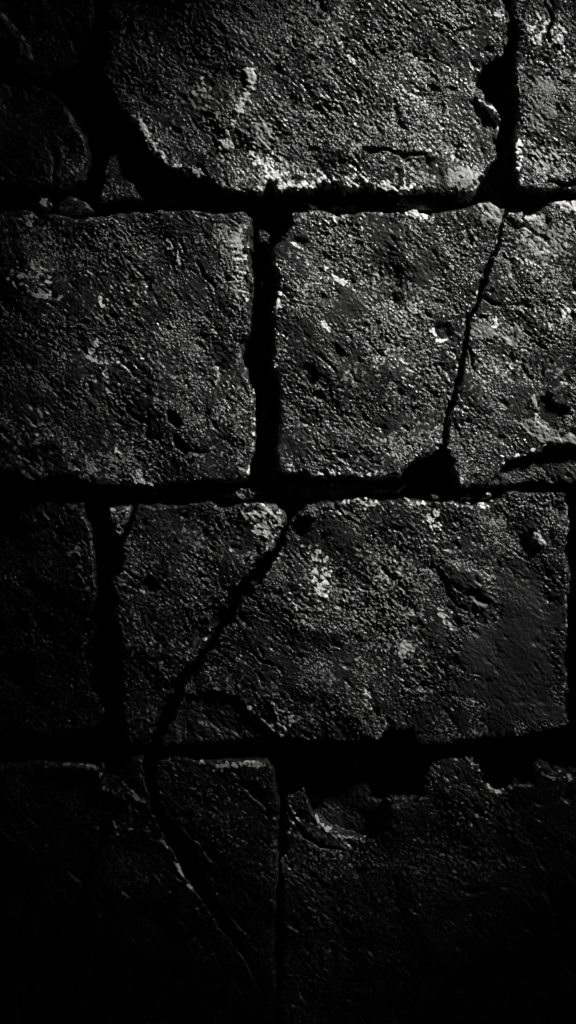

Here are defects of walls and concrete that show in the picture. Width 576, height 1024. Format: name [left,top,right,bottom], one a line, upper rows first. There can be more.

crack [440,213,534,450]
crack [143,515,291,995]